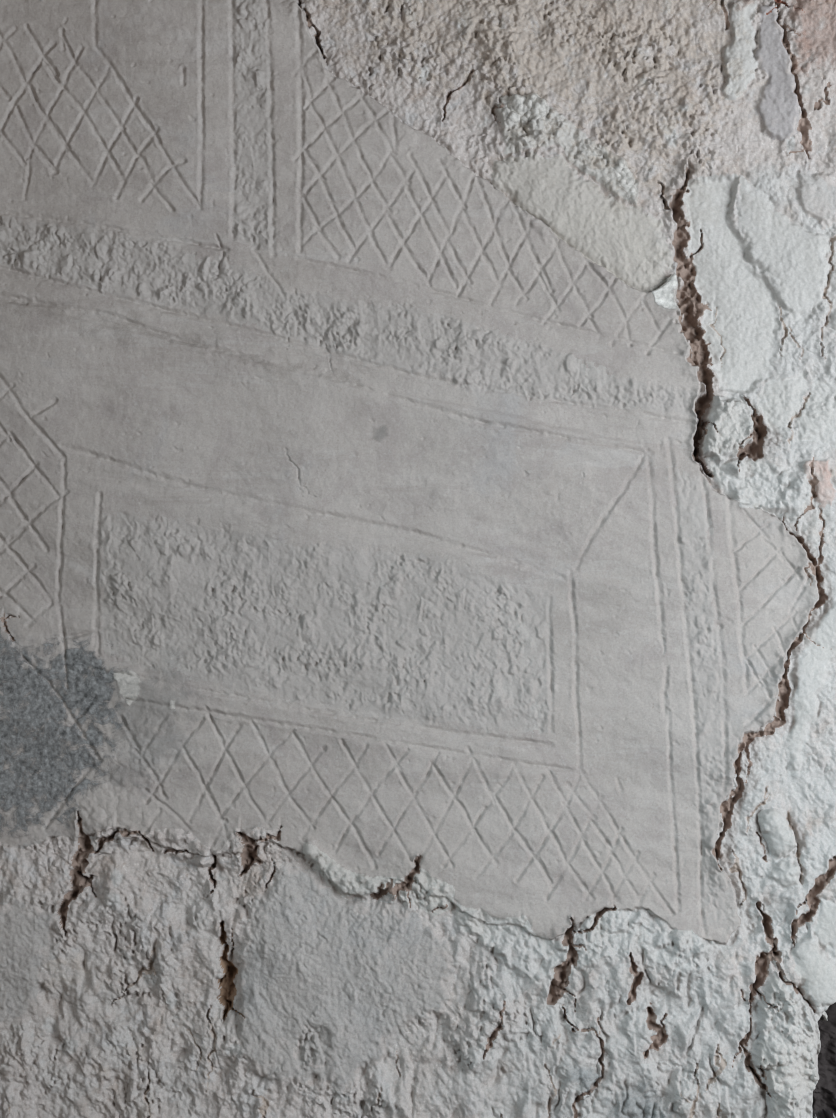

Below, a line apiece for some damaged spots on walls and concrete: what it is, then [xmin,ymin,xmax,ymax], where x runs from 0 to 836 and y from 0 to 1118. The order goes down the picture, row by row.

crack [766,0,831,159]
flaking render [0,216,696,418]
crack [659,167,811,478]
damp [0,628,140,832]
crack [57,811,282,933]
flaking render [93,827,279,873]
flaking render [98,510,556,737]
flaking render [303,842,712,985]
crack [544,905,617,1118]
crack [627,952,668,1059]
flaking render [673,457,812,929]
crack [681,457,836,1118]